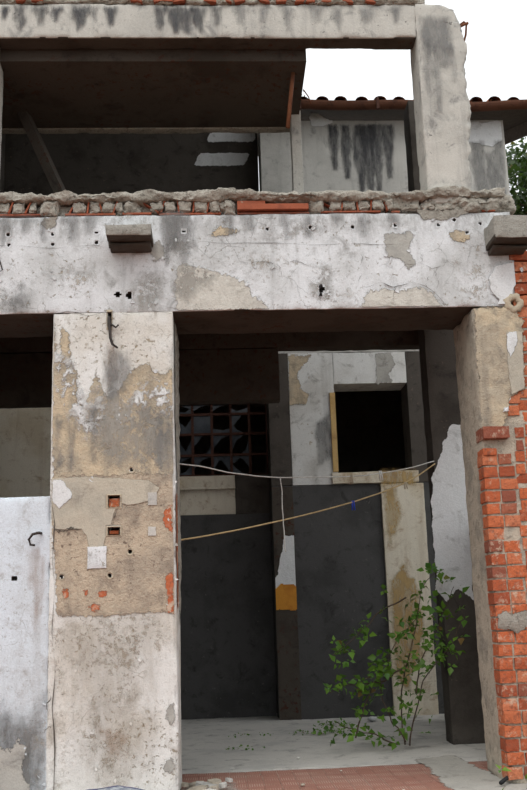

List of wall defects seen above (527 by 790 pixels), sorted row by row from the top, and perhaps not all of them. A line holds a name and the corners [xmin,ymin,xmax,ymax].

damp [73,7,89,28]
damp [106,7,116,24]
damp [156,7,219,32]
rust [286,72,312,129]
damp [329,124,393,192]
spalling [391,194,516,221]
flaking render [173,263,268,310]
crack [381,259,453,307]
flaking render [473,306,526,427]
flaking render [51,323,182,624]
flaking render [0,737,30,790]
damp [0,718,42,787]